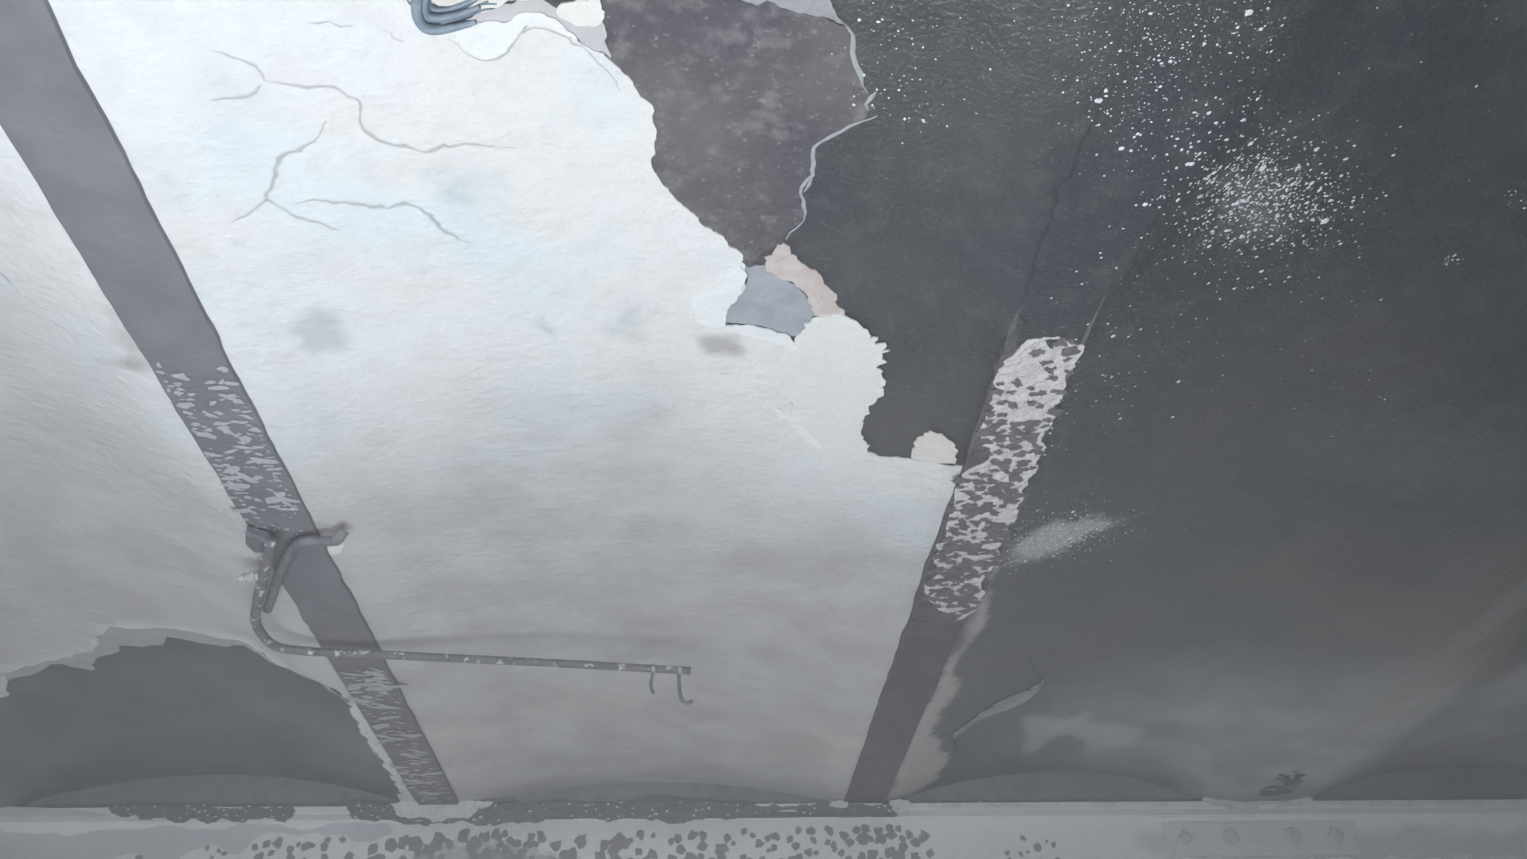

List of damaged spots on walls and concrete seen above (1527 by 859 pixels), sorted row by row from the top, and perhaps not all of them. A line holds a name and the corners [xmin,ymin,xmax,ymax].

leakage [852,0,948,133]
leakage [1049,0,1388,308]
peeling [0,0,1085,809]
leakage [994,252,1208,579]